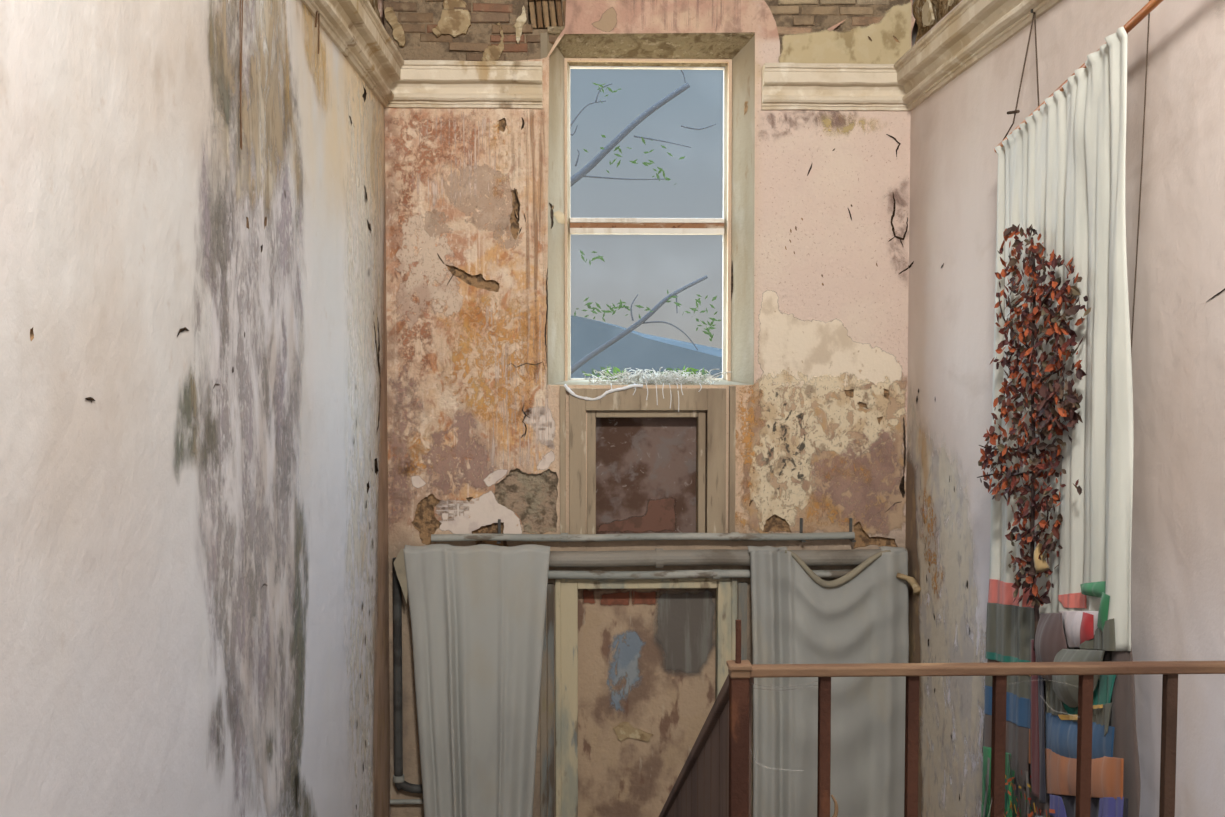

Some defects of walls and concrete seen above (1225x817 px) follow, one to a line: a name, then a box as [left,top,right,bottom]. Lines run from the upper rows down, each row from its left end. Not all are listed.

flaking render [369,0,566,61]
flaking render [764,0,962,64]
peeling [396,165,520,331]
crack [888,193,944,275]
water stain [176,0,311,817]
flaking render [411,407,559,547]
peeling [758,290,905,549]